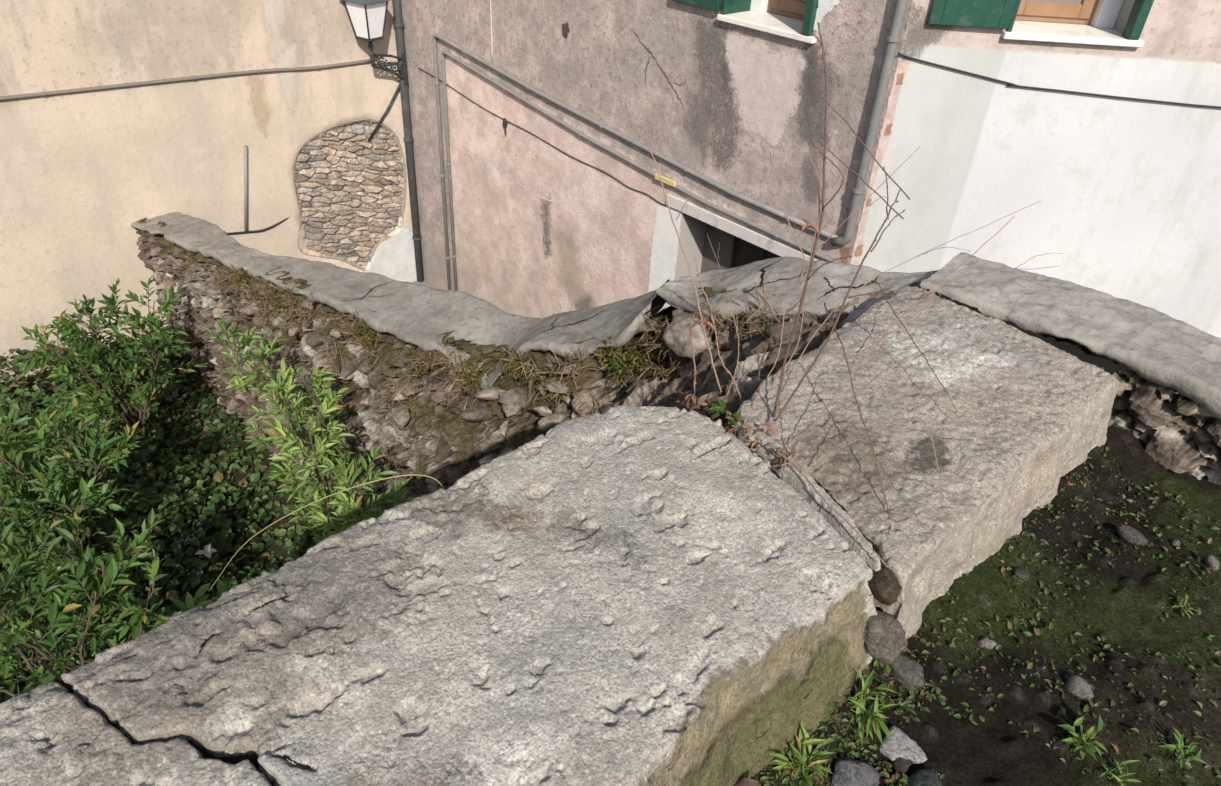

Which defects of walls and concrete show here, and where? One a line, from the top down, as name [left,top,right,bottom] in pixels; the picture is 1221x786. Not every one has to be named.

spalling [293,118,407,271]
leakage [688,20,740,169]
leakage [797,45,839,198]
crack [741,257,881,298]
crack [39,660,138,745]
crack [187,740,314,786]